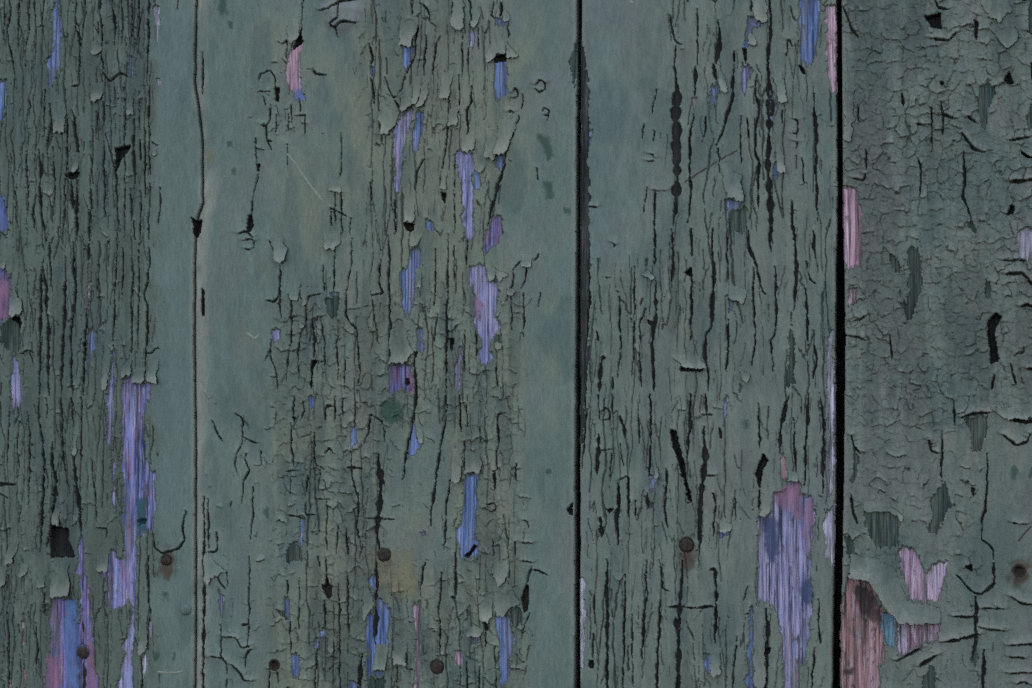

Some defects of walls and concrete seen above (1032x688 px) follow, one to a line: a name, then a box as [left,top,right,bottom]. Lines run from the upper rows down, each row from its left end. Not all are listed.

peeling [378,9,519,396]
crack [489,101,550,221]
peeling [797,0,856,142]
crack [901,95,933,193]
crack [961,156,971,217]
crack [267,0,517,688]
peeling [0,328,159,688]
crack [141,415,262,688]
peeling [349,575,422,688]
peeling [451,448,482,559]
peeling [744,330,948,688]
crack [958,464,995,688]